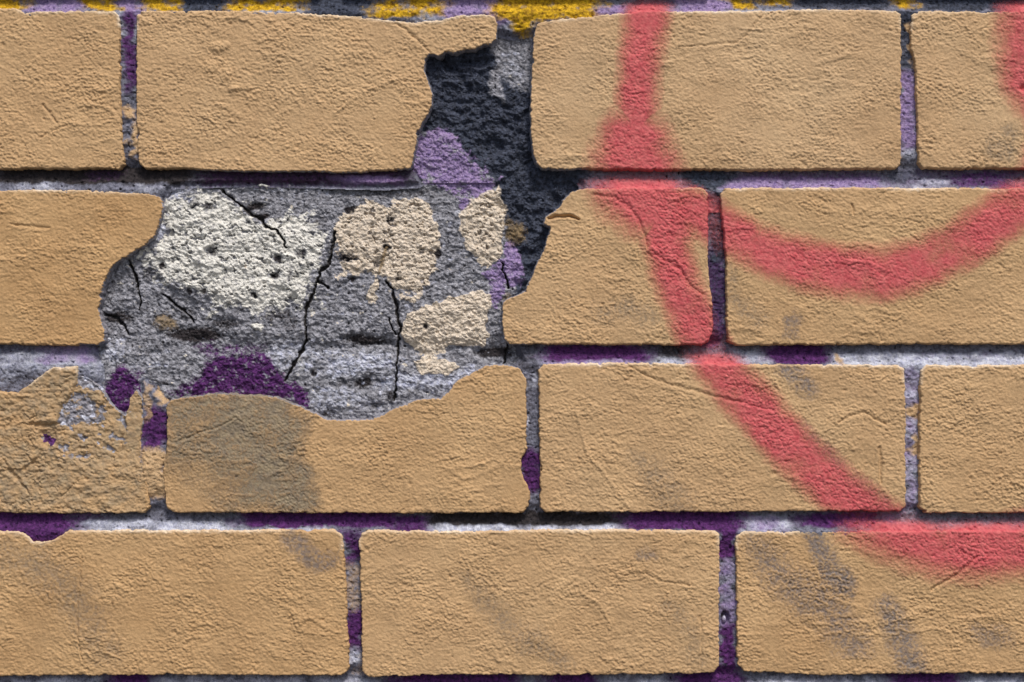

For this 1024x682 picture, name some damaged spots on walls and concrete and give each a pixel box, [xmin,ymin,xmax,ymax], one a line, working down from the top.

crack [106,260,195,335]
crack [222,189,287,248]
spalling [38,37,580,451]
crack [284,231,336,381]
crack [386,280,403,401]